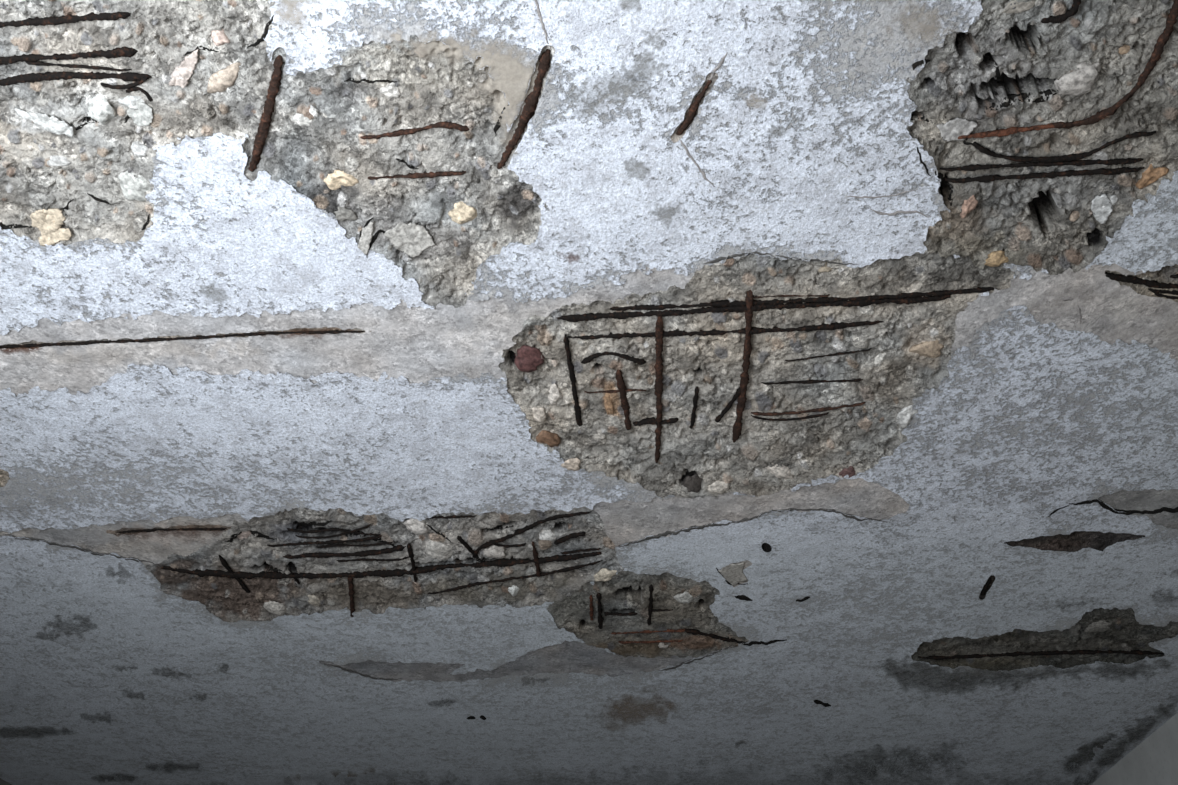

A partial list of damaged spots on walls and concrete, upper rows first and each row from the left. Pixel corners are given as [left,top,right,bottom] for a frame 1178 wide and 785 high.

spalling [0,0,1178,498]
spalling [1004,531,1145,552]
crack [1048,499,1178,517]
peeling [1098,489,1178,529]
spalling [0,507,752,684]
spalling [911,607,1178,672]